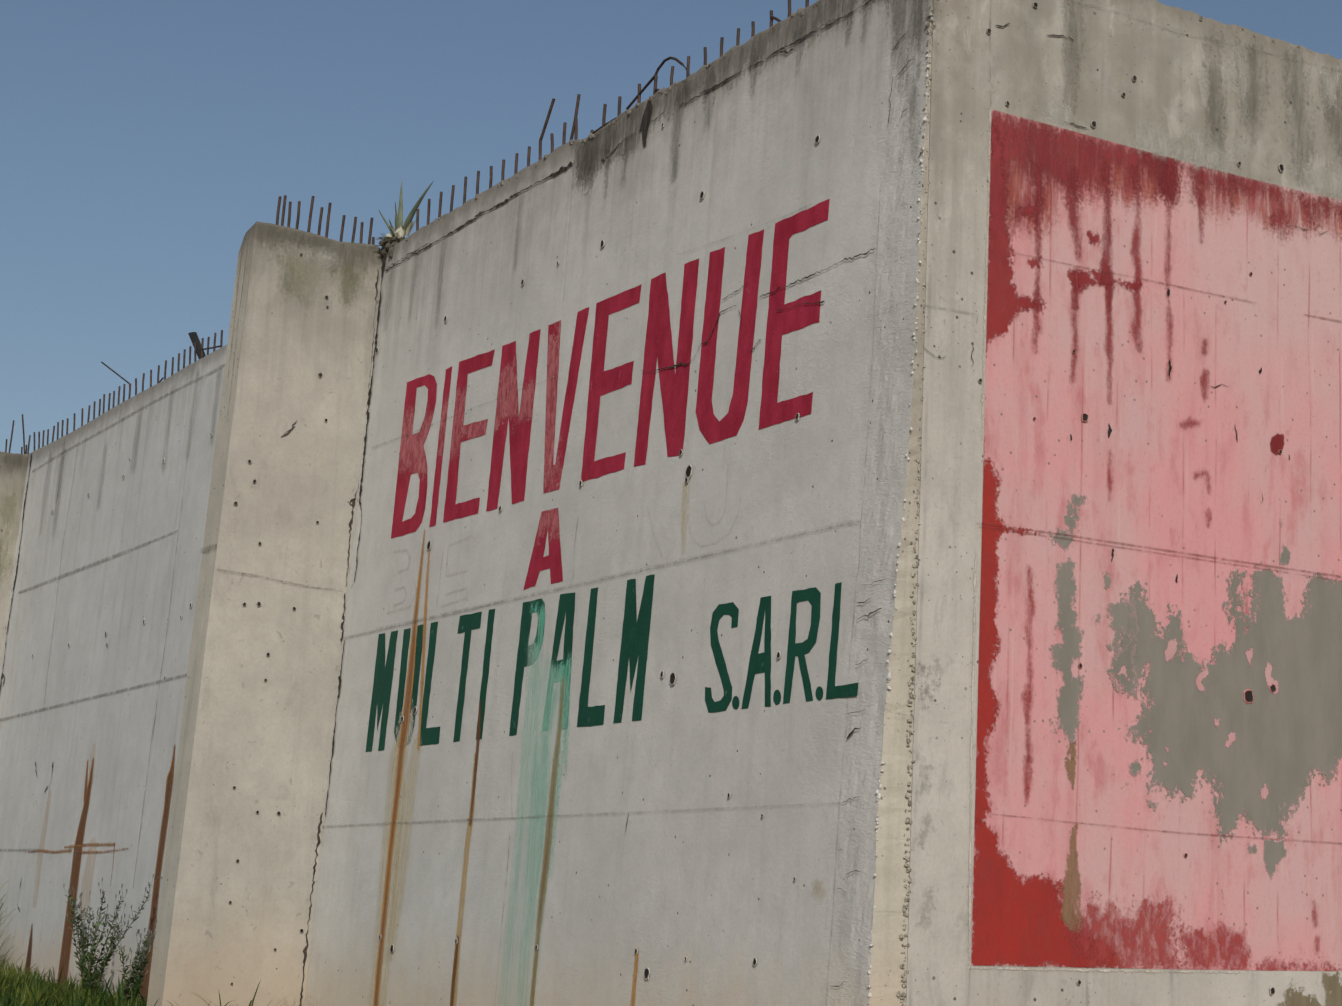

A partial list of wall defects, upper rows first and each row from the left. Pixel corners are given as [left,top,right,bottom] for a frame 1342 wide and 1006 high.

leakage [576,0,869,178]
leakage [1071,268,1080,376]
leakage [1133,290,1142,349]
corrosion [28,758,124,984]
corrosion [139,746,175,1002]
corrosion [373,530,430,1006]
corrosion [450,702,481,1006]
corrosion [530,681,564,1006]
crack [299,0,875,1006]
crack [857,579,886,619]
peeling [1048,492,1342,879]
peeling [1180,925,1342,1006]